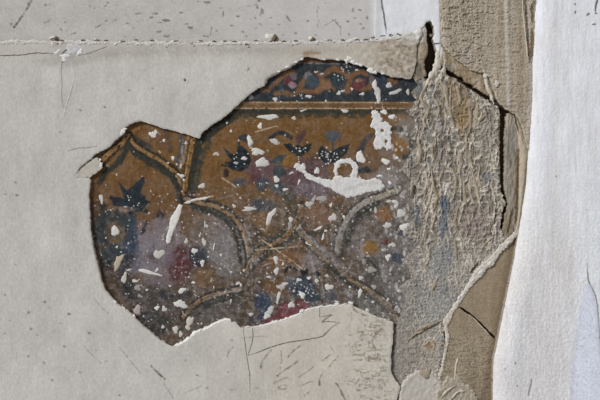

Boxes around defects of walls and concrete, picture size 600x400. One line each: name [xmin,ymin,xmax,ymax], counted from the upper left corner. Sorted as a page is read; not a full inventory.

flaking render [75,156,103,178]
peeling [233,135,269,167]
peeling [257,114,278,129]
peeling [289,151,399,198]
peeling [336,56,410,151]
crack [424,23,519,238]
peeling [153,196,211,259]
peeling [298,195,345,221]
peeling [382,190,408,231]
flaking render [91,233,363,346]
crack [459,307,495,339]
peeling [438,230,518,380]